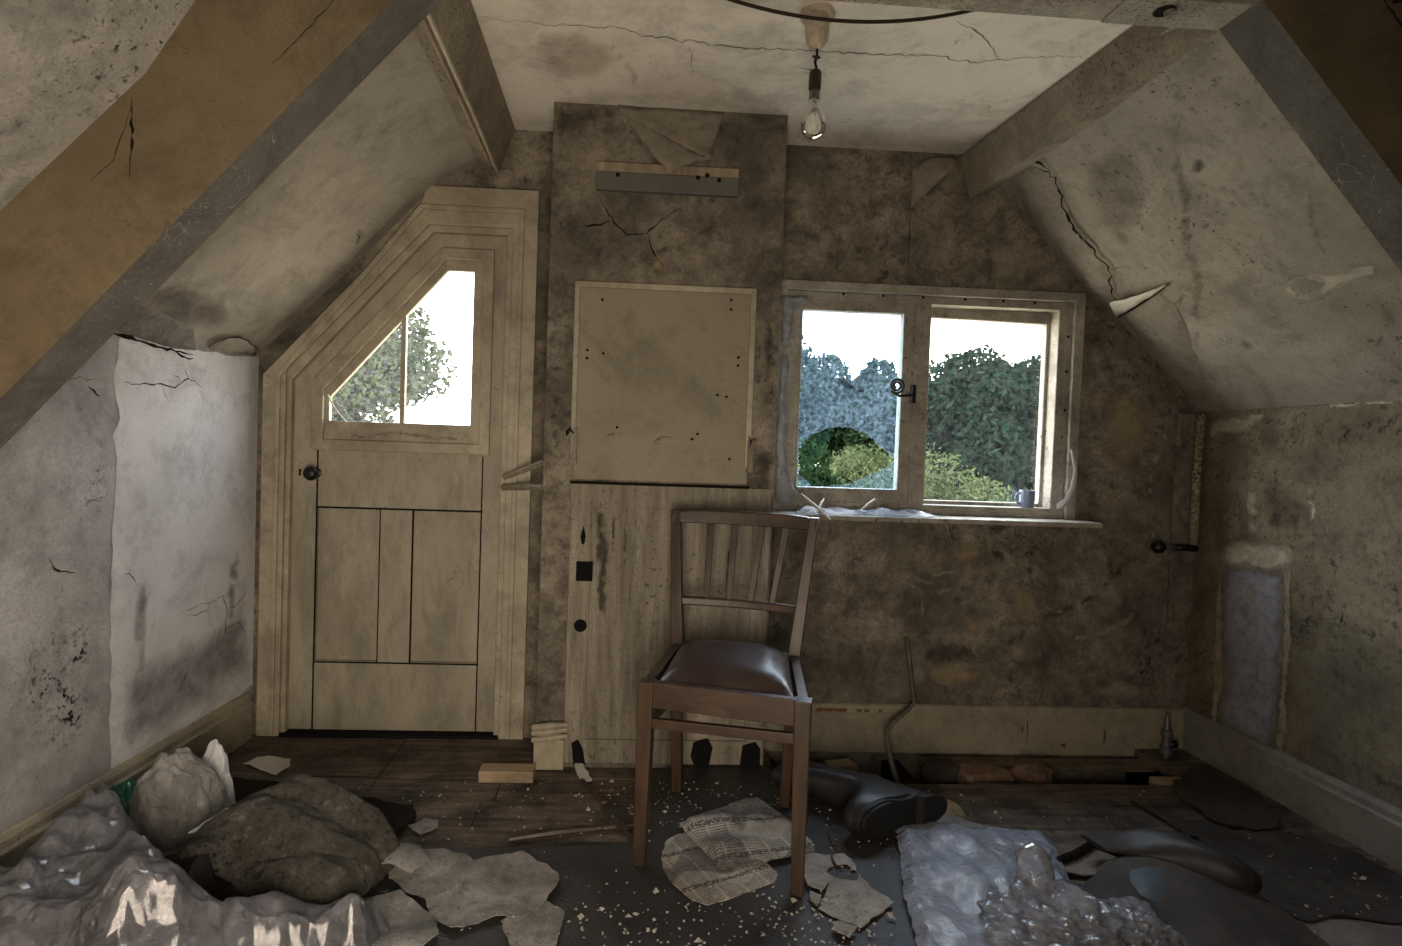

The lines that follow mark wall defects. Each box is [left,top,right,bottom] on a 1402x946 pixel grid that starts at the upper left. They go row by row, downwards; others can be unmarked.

crack [479,16,1089,75]
crack [1031,161,1119,301]
crack [68,333,259,407]
peeling [1212,493,1291,752]
leakage [30,667,82,741]